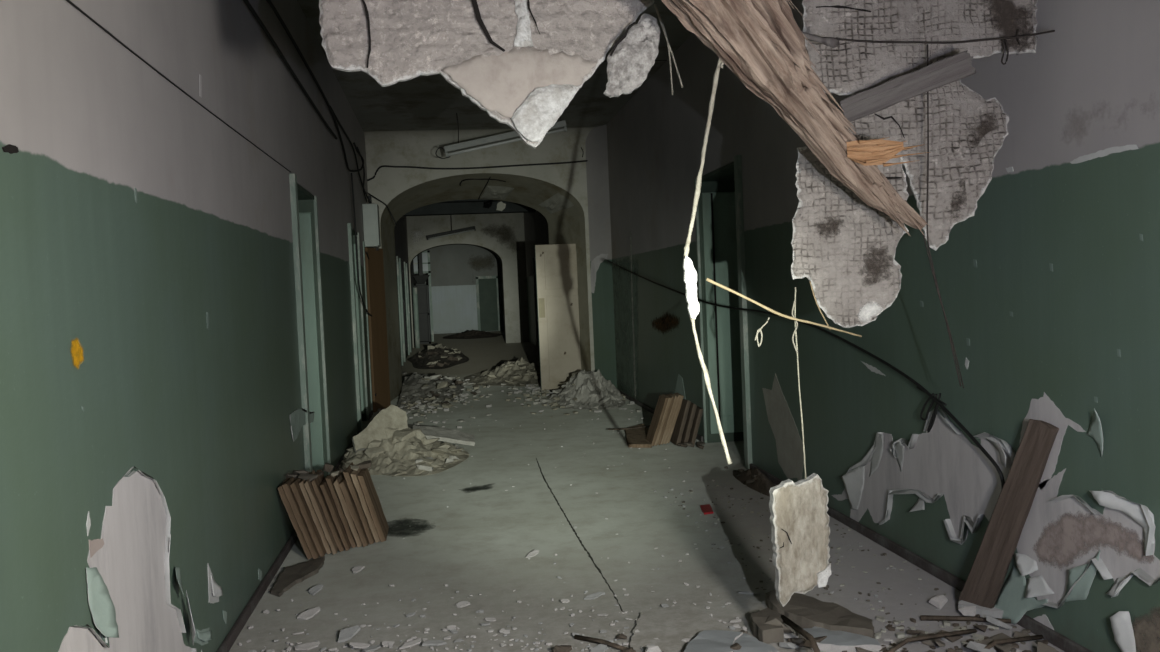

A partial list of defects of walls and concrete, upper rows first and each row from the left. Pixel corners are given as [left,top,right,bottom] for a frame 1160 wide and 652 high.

flaking render [480,186,514,211]
peeling [590,254,608,293]
peeling [58,466,212,652]
crack [536,458,623,612]
peeling [831,392,1160,630]
peeling [208,564,227,623]
peeling [1110,611,1160,652]